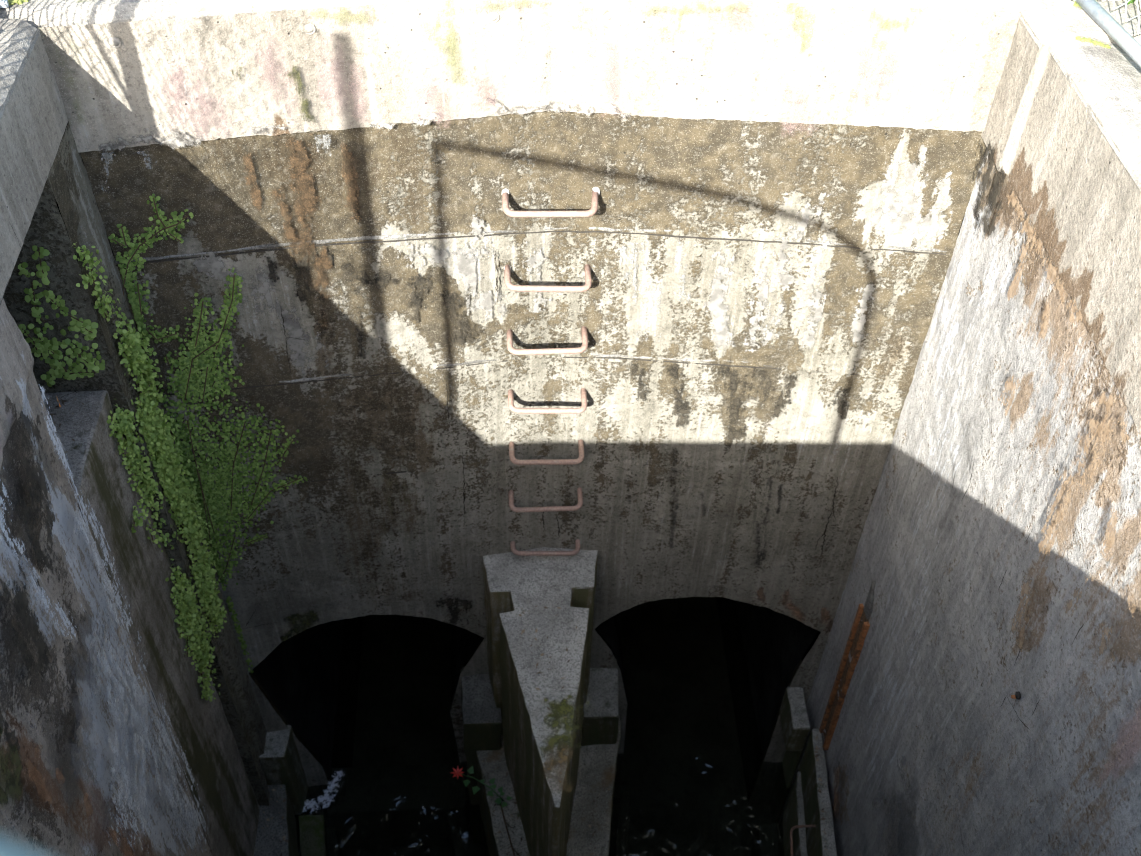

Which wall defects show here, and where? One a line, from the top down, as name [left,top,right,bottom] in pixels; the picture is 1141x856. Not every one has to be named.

damp [314,134,332,155]
damp [973,140,1006,238]
damp [266,257,279,283]
damp [291,250,485,351]
damp [630,365,650,401]
damp [667,364,690,428]
damp [711,365,797,440]
damp [828,389,850,420]
damp [755,477,782,567]
damp [0,384,209,856]